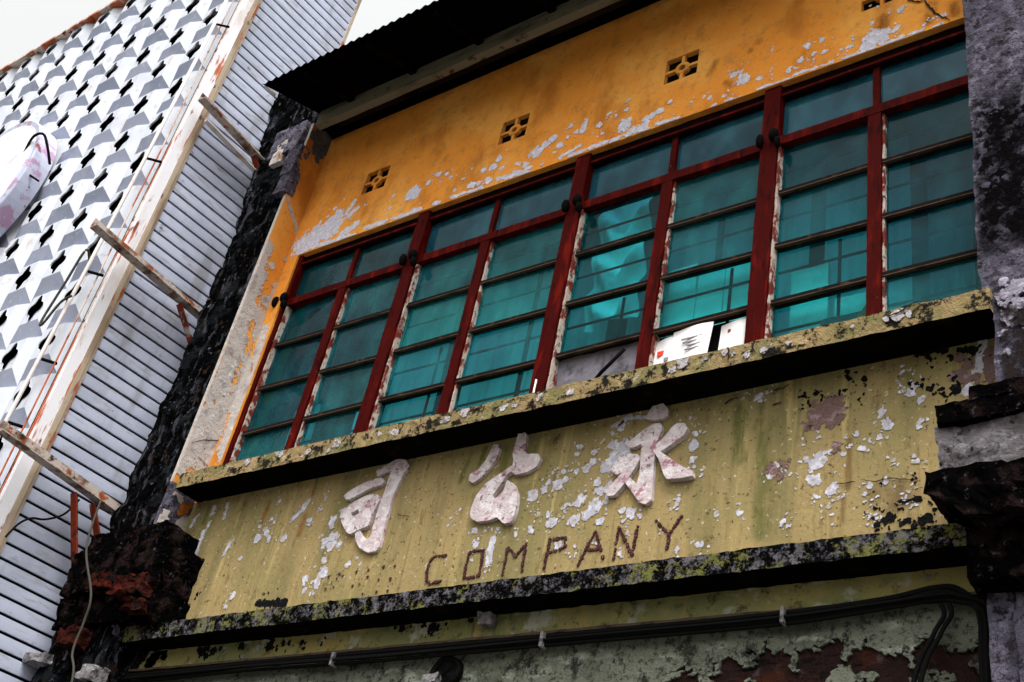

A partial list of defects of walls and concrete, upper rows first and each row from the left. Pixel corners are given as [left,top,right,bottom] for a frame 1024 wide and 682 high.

peeling [690,4,948,107]
peeling [176,98,681,475]
peeling [668,357,709,374]
peeling [721,341,792,359]
peeling [741,385,774,409]
peeling [895,364,927,405]
peeling [679,413,707,478]
flaking render [761,393,928,528]